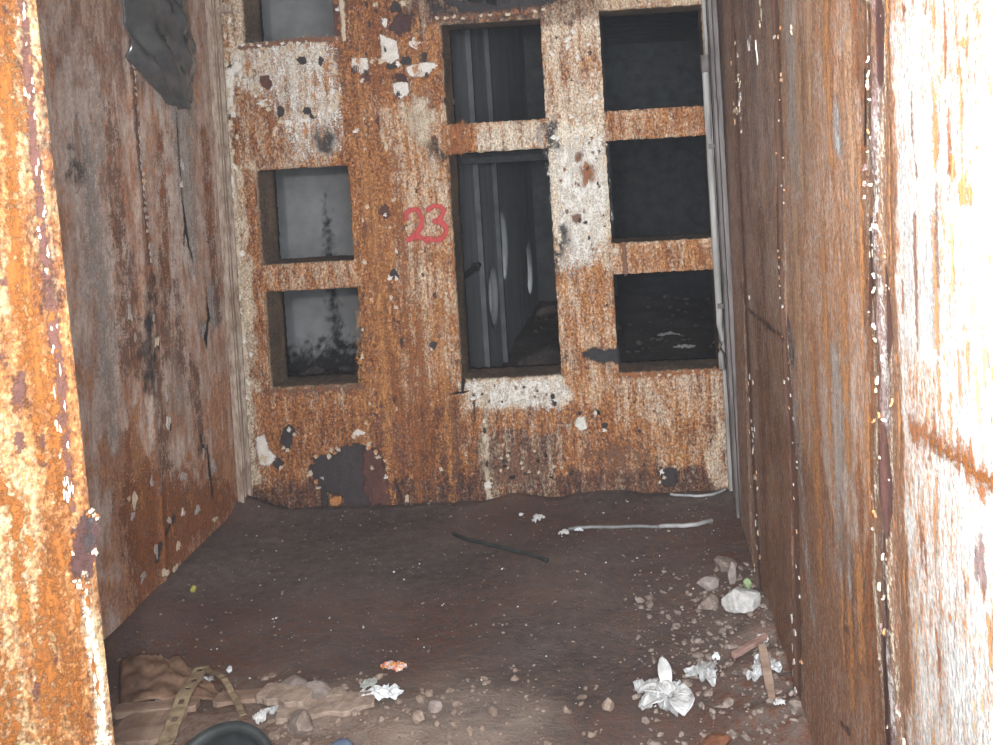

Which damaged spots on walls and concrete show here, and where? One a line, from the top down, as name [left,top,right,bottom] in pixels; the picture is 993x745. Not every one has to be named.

corrosion [0,0,93,745]
peeling [17,0,112,745]
corrosion [102,63,238,617]
crack [176,112,197,258]
crack [199,284,219,349]
peeling [223,17,360,486]
corrosion [237,0,466,505]
spalling [307,429,409,506]
peeling [351,0,438,174]
corrosion [738,0,877,745]
corrosion [888,105,918,352]
corrosion [902,0,993,745]